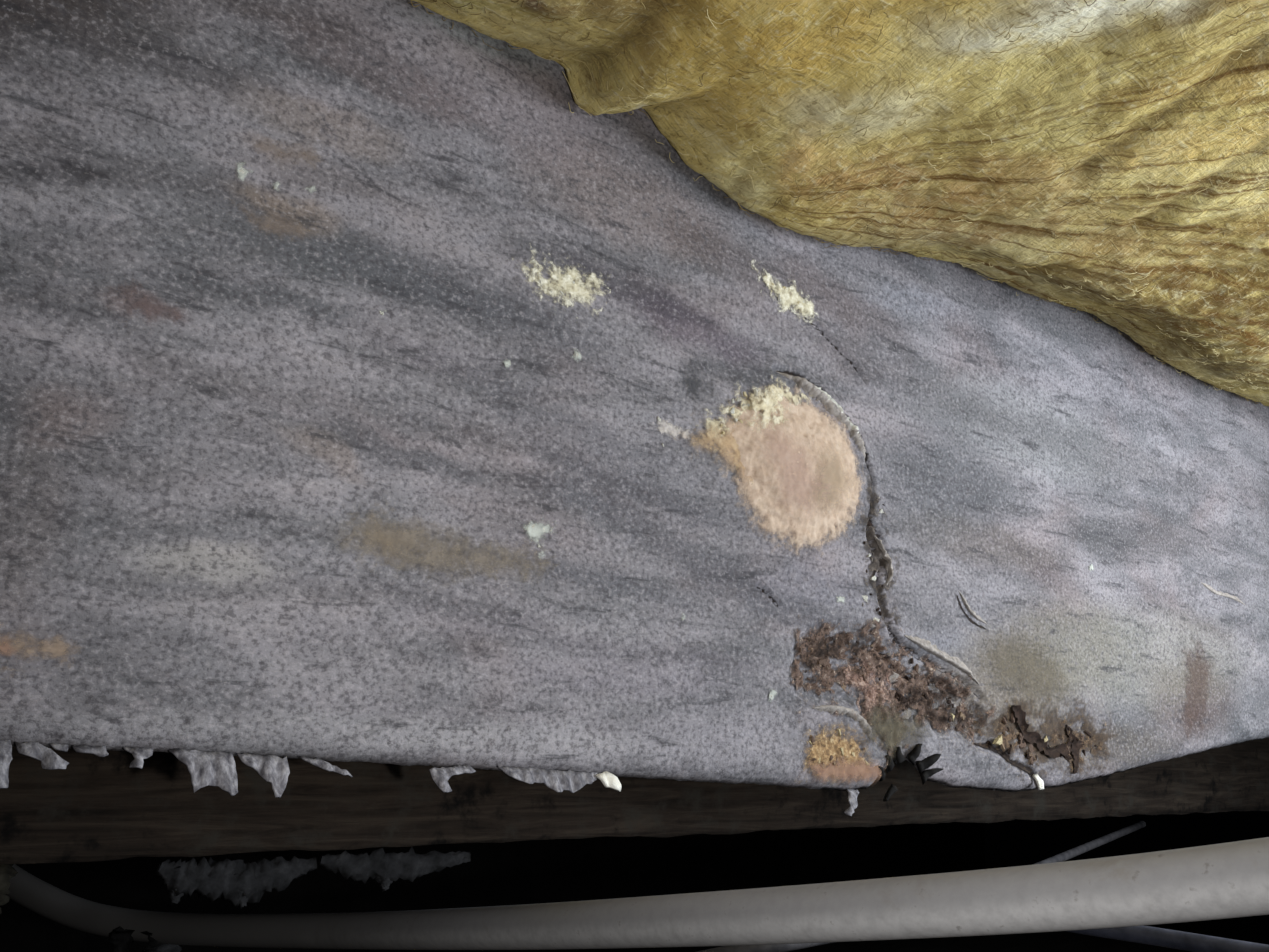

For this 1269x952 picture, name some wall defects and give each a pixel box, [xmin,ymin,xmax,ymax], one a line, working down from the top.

spalling [657,371,869,548]
crack [860,465,979,698]
crack [957,590,988,629]
peeling [0,740,109,789]
peeling [123,747,153,769]
peeling [169,748,353,798]
peeling [429,765,476,793]
peeling [497,766,621,793]
corrosion [804,724,881,780]
corrosion [951,701,1111,790]